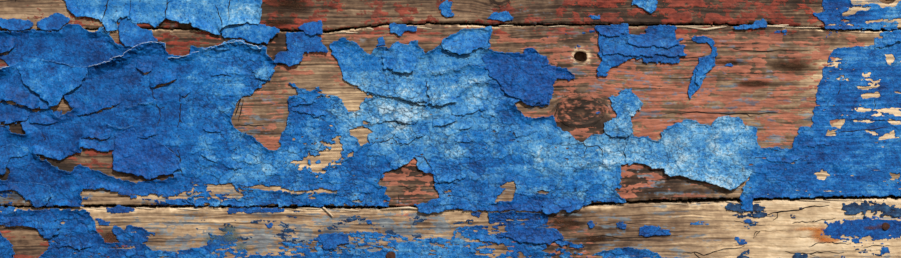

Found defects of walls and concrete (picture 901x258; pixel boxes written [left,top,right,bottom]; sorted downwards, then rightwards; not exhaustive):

peeling [0,0,105,135]
peeling [42,0,901,151]
peeling [0,167,60,258]
peeling [35,95,516,258]
peeling [536,161,901,258]
rust [801,228,838,242]